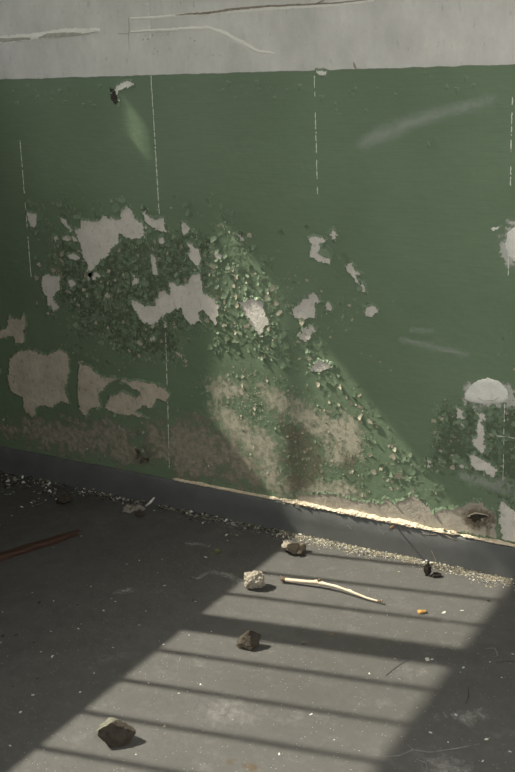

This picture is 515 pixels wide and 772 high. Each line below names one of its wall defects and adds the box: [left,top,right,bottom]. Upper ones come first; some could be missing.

peeling [106,79,136,106]
peeling [24,209,39,230]
peeling [0,312,172,420]
peeling [38,195,515,547]